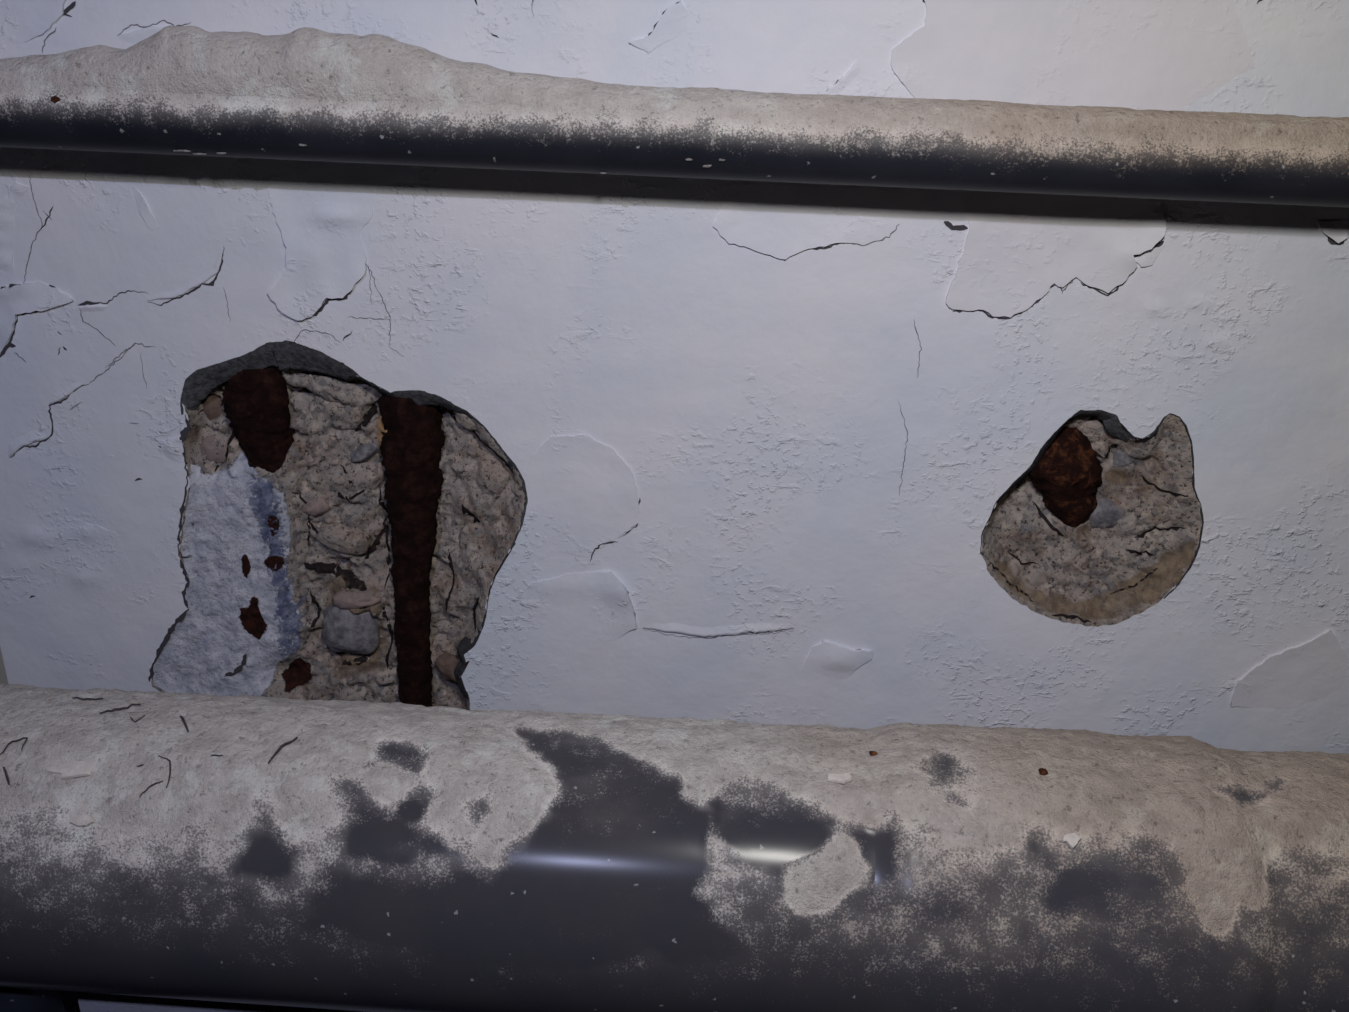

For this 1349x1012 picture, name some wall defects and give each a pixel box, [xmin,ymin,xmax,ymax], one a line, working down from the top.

peeling [891,0,1255,111]
crack [0,176,229,458]
corrosion [239,597,268,639]
corrosion [241,554,285,578]
spalling [151,340,528,710]
spalling [980,410,1204,627]
corrosion [281,657,312,693]